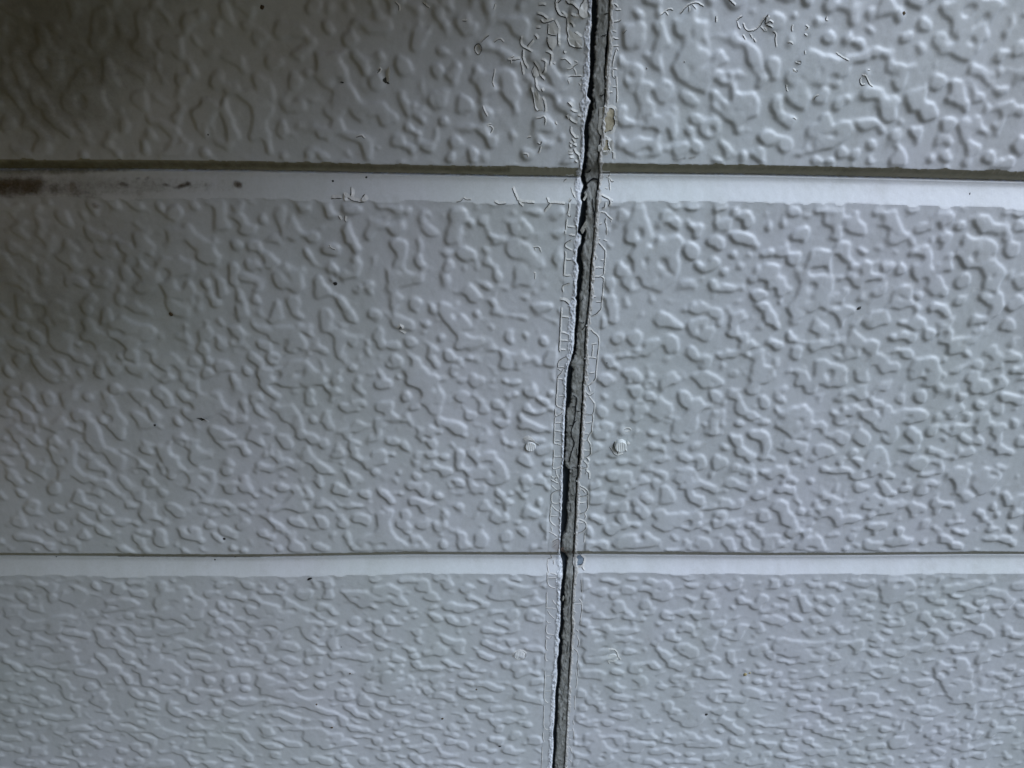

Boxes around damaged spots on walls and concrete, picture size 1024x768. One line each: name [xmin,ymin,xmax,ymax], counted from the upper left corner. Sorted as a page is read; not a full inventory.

crack [456,0,632,768]
peeling [547,0,618,768]